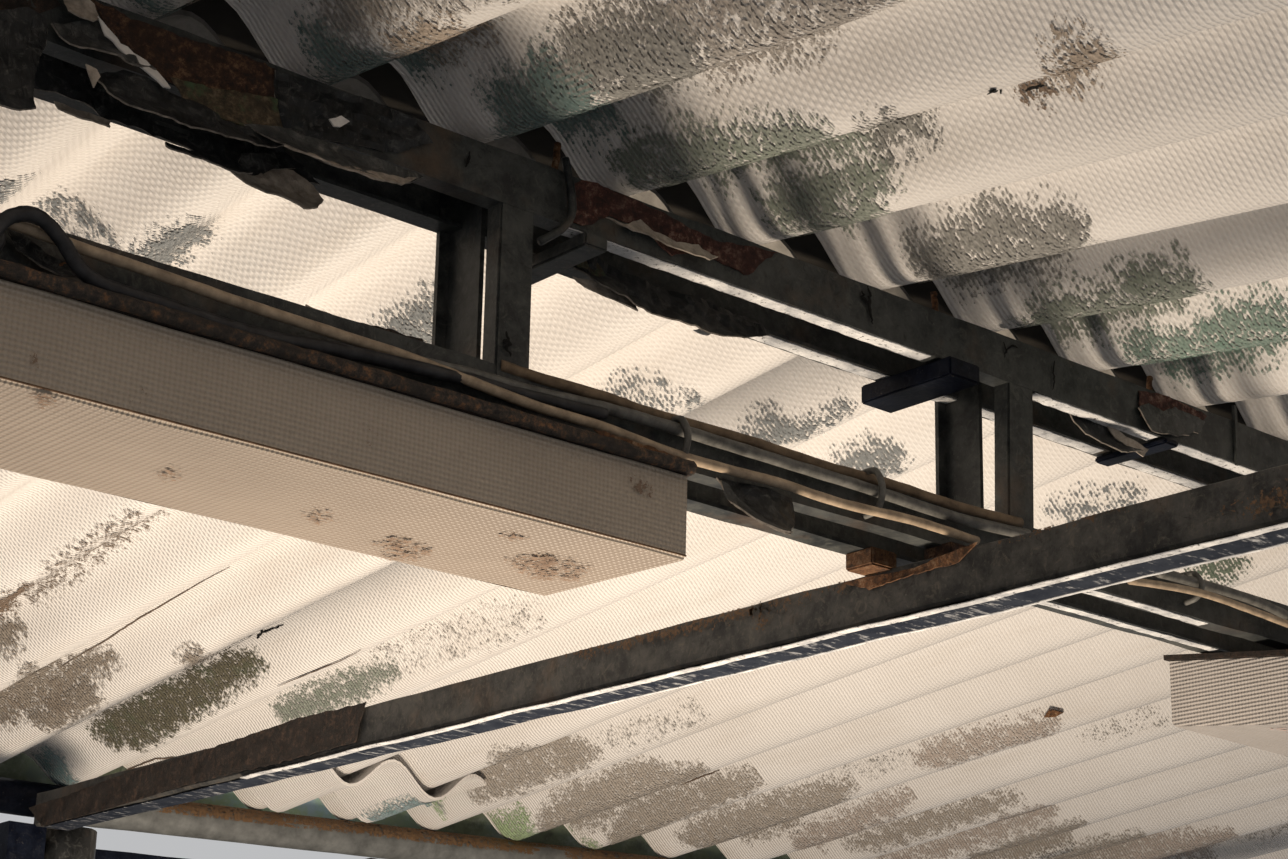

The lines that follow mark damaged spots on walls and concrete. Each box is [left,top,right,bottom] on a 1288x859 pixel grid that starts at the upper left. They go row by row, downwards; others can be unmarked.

rust [91,0,283,127]
peeling [0,0,424,210]
peeling [7,229,77,278]
peeling [0,172,222,268]
rust [573,180,777,275]
peeling [288,0,1288,389]
rust [998,506,1129,544]
rust [562,542,978,660]